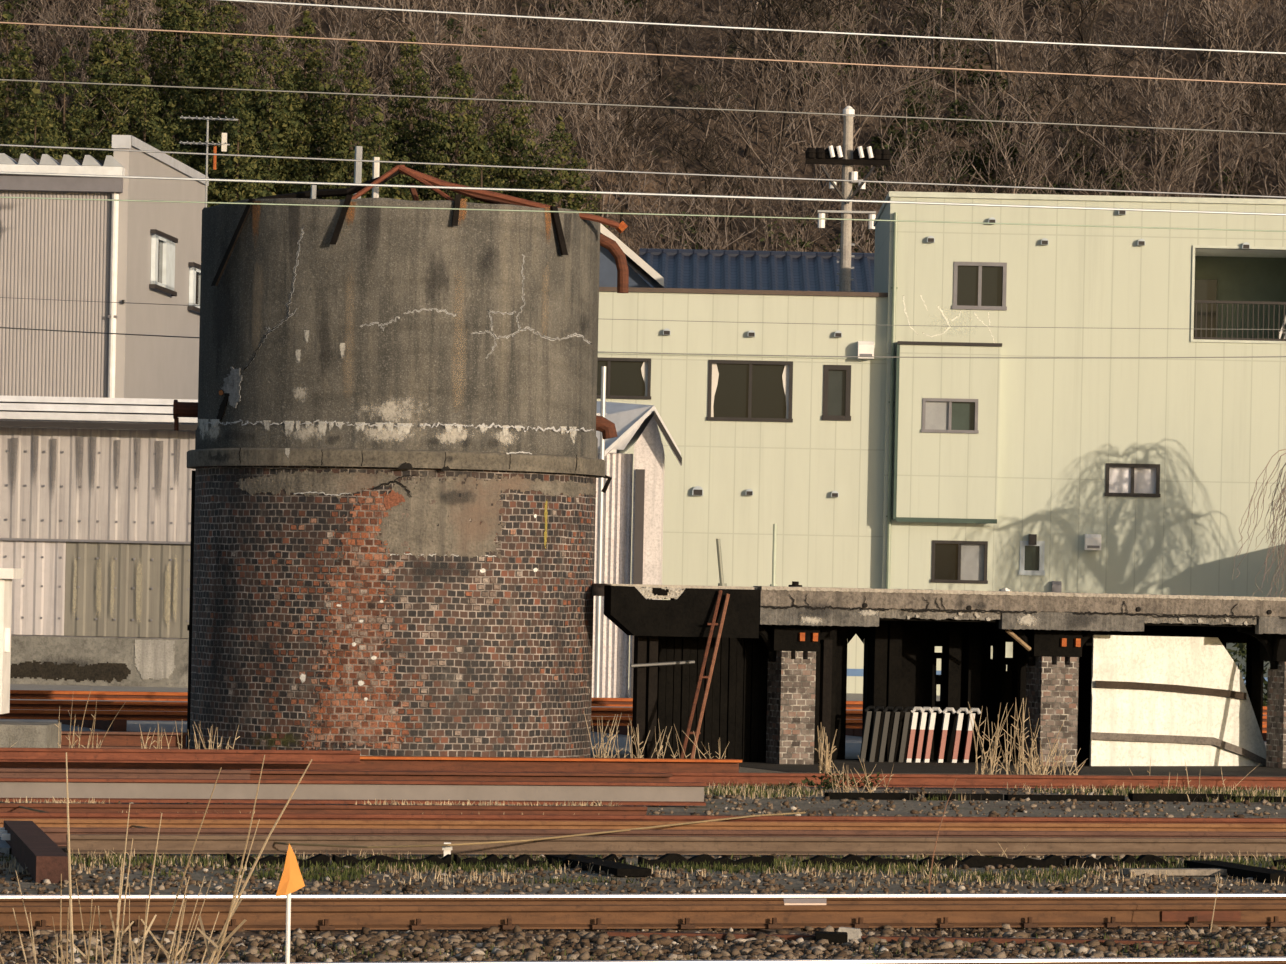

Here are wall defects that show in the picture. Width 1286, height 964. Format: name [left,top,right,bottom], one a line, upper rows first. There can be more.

spalling [216,367,242,424]
crack [244,228,304,370]
water stain [198,397,591,457]
rust [452,279,465,402]
crack [360,254,592,359]
spalling [245,487,439,752]
spalling [554,487,593,686]